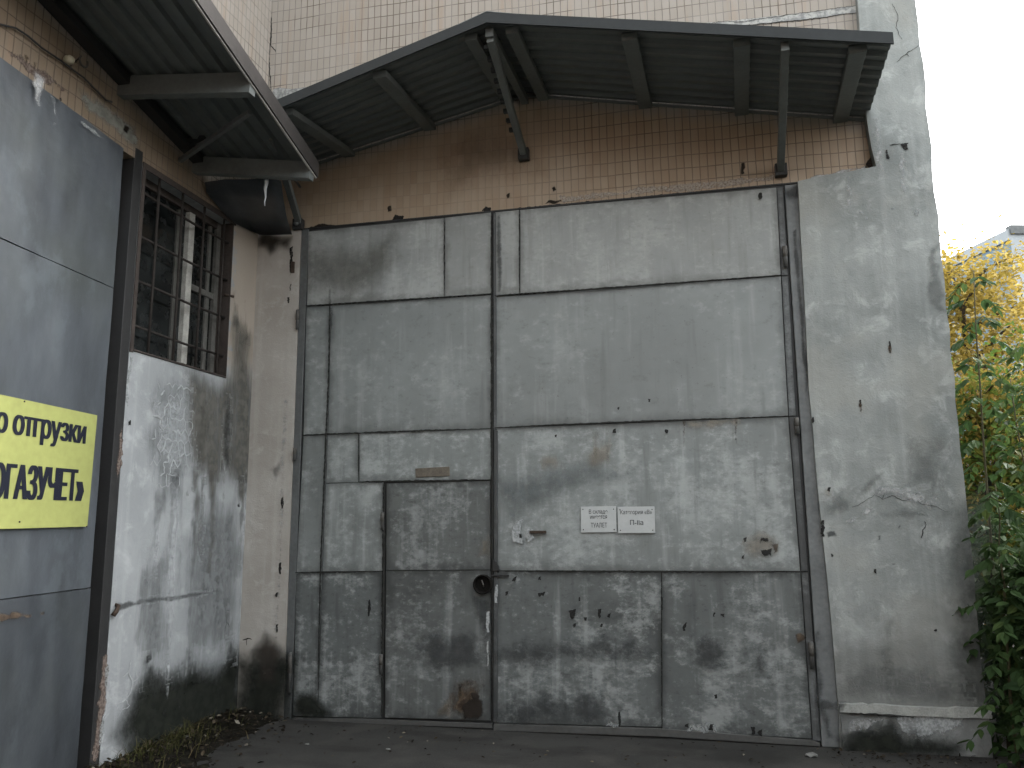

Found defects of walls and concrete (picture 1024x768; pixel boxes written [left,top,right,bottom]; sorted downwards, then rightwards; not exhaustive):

damp [144,318,252,656]
crack [853,492,947,538]
rust [760,538,778,556]
damp [120,637,296,753]
rust [448,681,483,718]
damp [842,725,959,755]